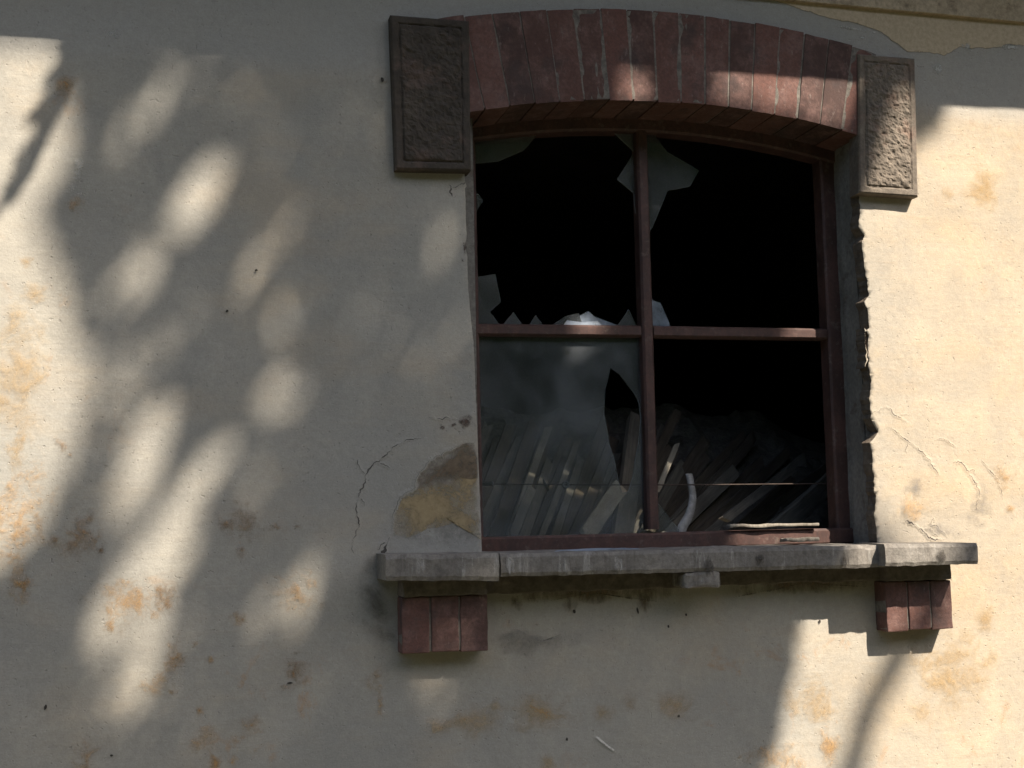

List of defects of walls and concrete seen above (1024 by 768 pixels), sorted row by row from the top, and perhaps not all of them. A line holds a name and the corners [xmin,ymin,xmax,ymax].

peeling [778,1,1024,73]
crack [351,437,424,553]
crack [900,516,949,542]
crack [873,405,1004,510]